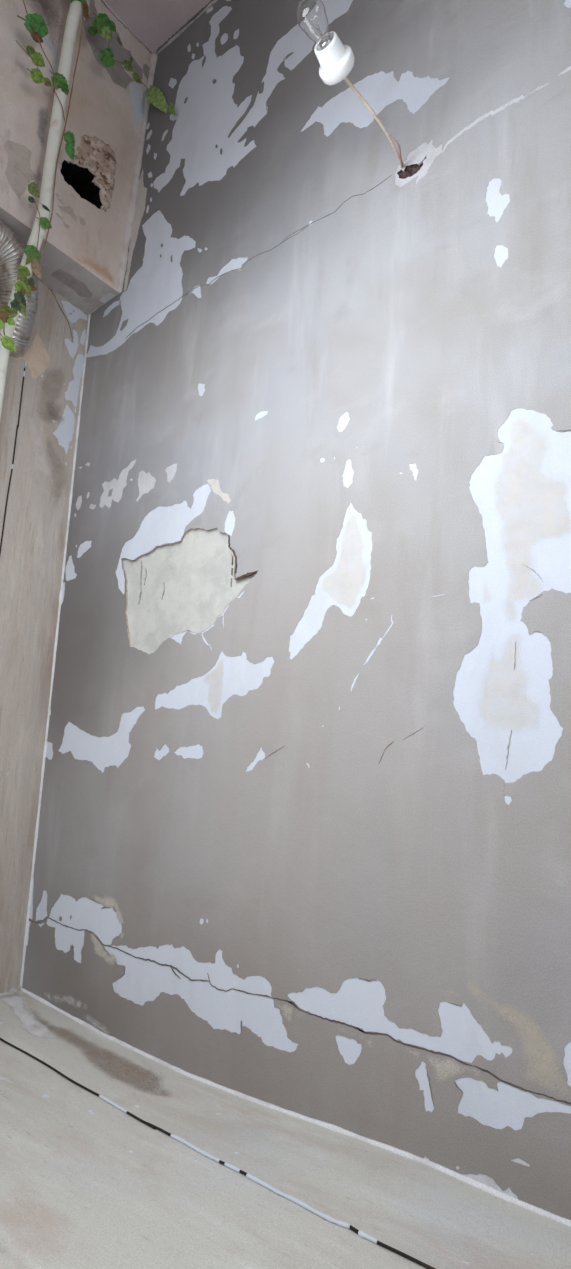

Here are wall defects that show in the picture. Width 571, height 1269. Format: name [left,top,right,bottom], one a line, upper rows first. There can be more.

peeling [51,0,315,469]
peeling [301,71,450,137]
flaking render [395,140,442,187]
crack [441,66,571,154]
peeling [74,459,177,517]
flaking render [116,479,258,654]
peeling [289,447,375,660]
peeling [453,408,571,805]
peeling [46,651,274,773]
peeling [27,877,298,1052]
crack [29,917,571,1104]
peeling [288,978,571,1131]